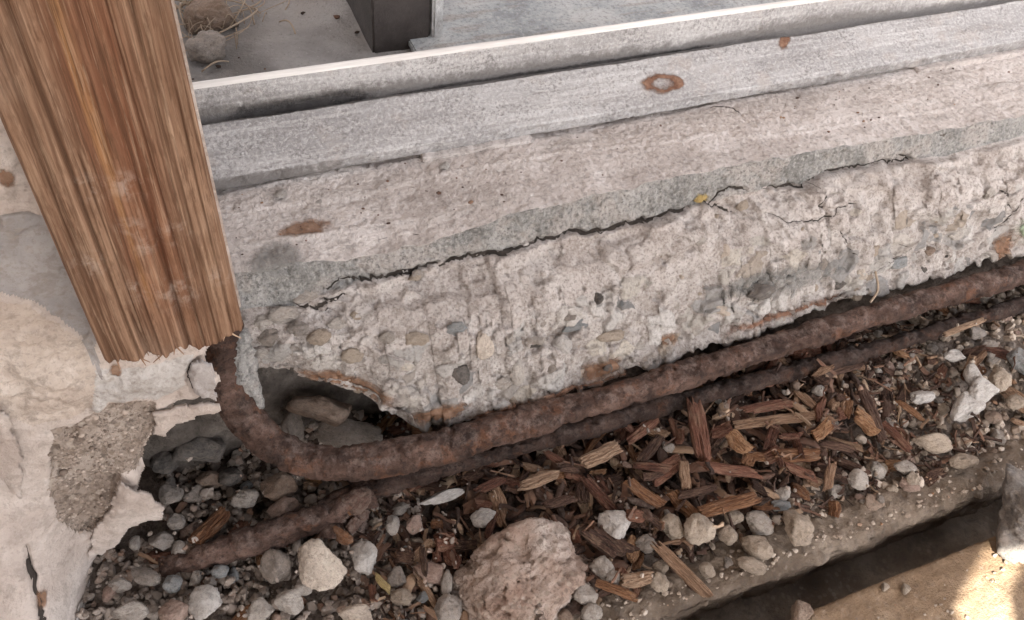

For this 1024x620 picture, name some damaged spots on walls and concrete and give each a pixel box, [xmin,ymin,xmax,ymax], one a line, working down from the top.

rust [642,74,684,93]
rust [779,37,790,49]
rust [280,220,329,236]
crack [292,154,912,311]
spalling [240,136,1024,433]
spalling [47,359,221,559]
rust [158,236,1024,578]